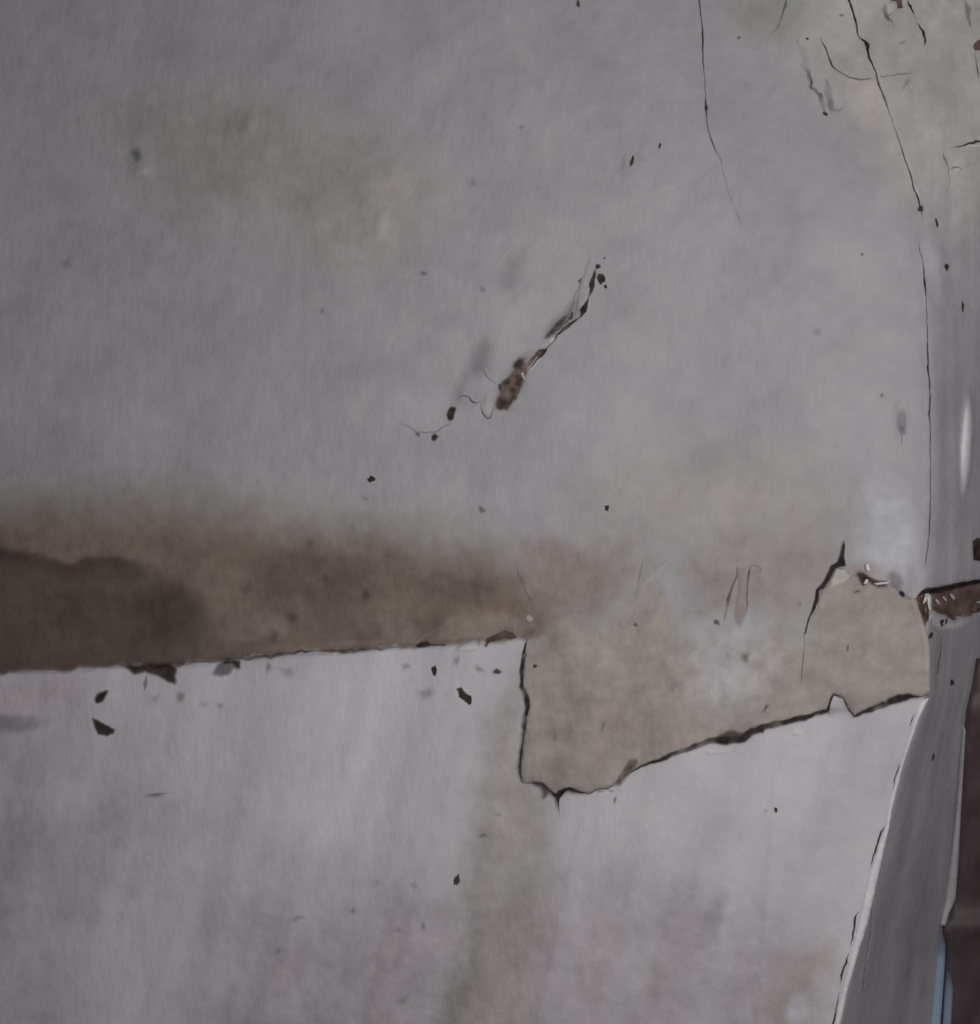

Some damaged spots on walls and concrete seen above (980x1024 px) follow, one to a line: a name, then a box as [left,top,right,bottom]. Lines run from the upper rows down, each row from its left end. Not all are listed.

crack [697,0,705,68]
crack [848,0,891,110]
crack [881,1,926,46]
crack [897,135,923,212]
crack [925,325,933,444]
leakage [0,402,928,1024]
peeling [412,557,980,794]